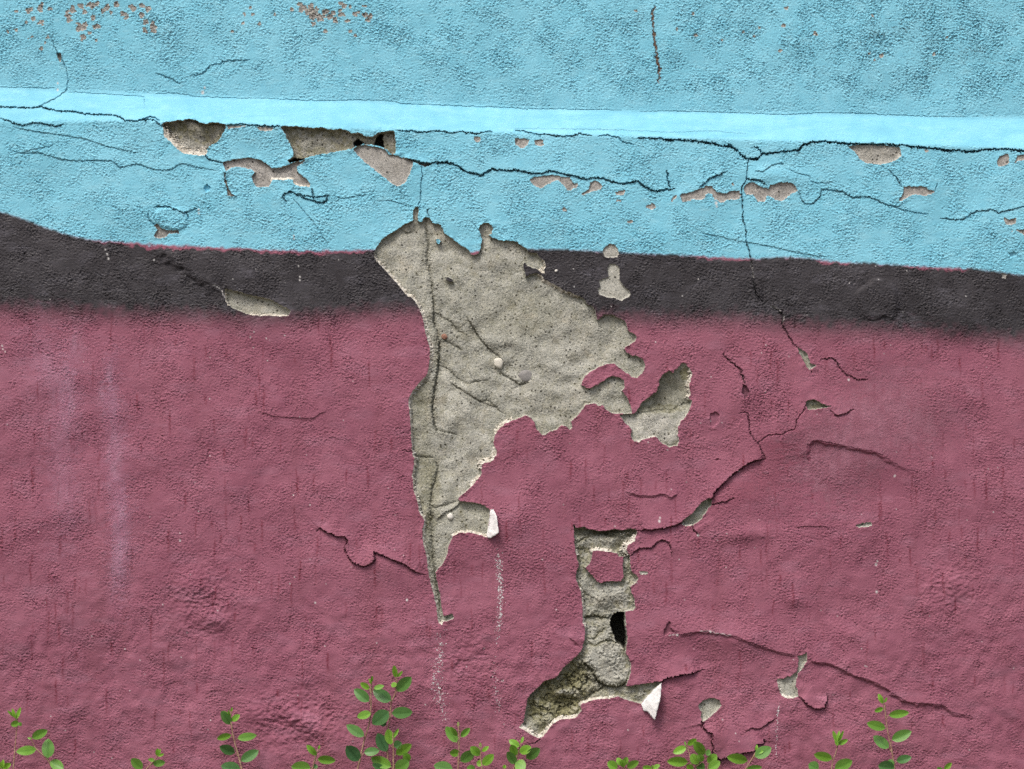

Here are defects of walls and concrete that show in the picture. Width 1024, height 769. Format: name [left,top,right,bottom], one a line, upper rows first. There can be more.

spalling [162,118,413,187]
spalling [849,144,902,165]
crack [0,35,1024,348]
peeling [671,182,798,202]
spalling [224,289,290,317]
crack [810,357,868,381]
spalling [374,207,692,625]
crack [711,404,932,506]
crack [316,527,426,576]
crack [626,491,699,558]
spalling [519,525,662,738]
crack [675,631,994,727]